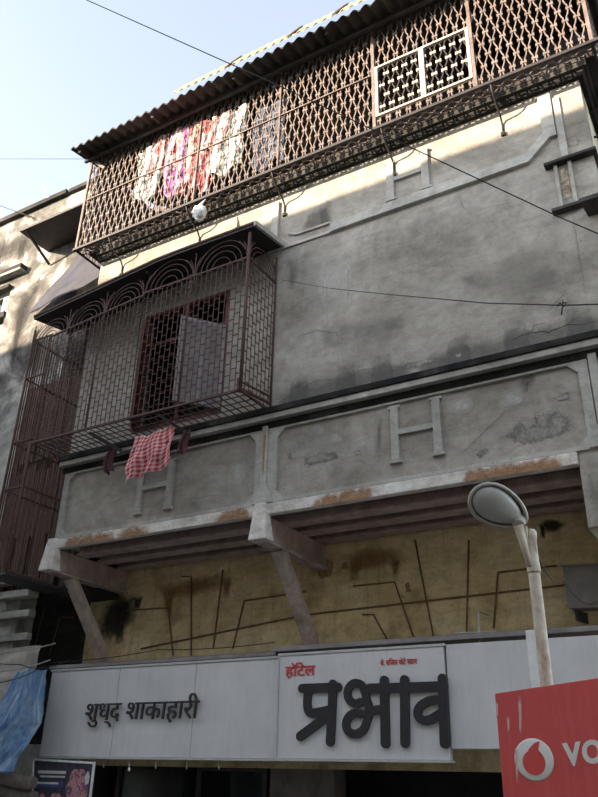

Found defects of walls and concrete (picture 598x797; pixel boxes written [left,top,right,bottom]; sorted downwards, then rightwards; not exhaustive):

crack [508,294,597,341]
spalling [506,411,570,445]
rust [466,460,560,481]
rust [314,490,370,506]